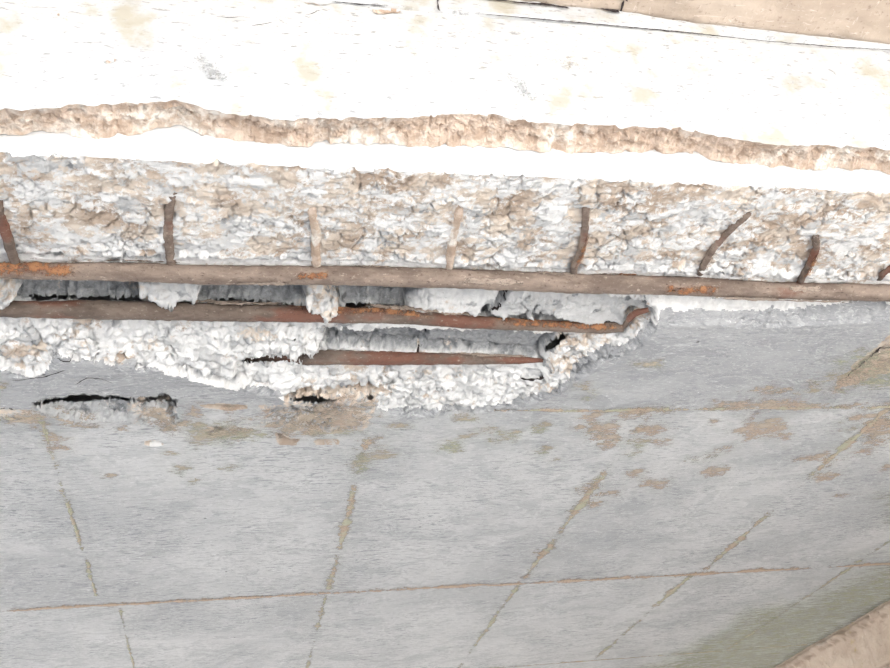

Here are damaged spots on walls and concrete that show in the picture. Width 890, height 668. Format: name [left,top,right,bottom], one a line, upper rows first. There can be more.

crack [478,0,889,50]
spalling [0,100,890,174]
spalling [0,151,890,446]